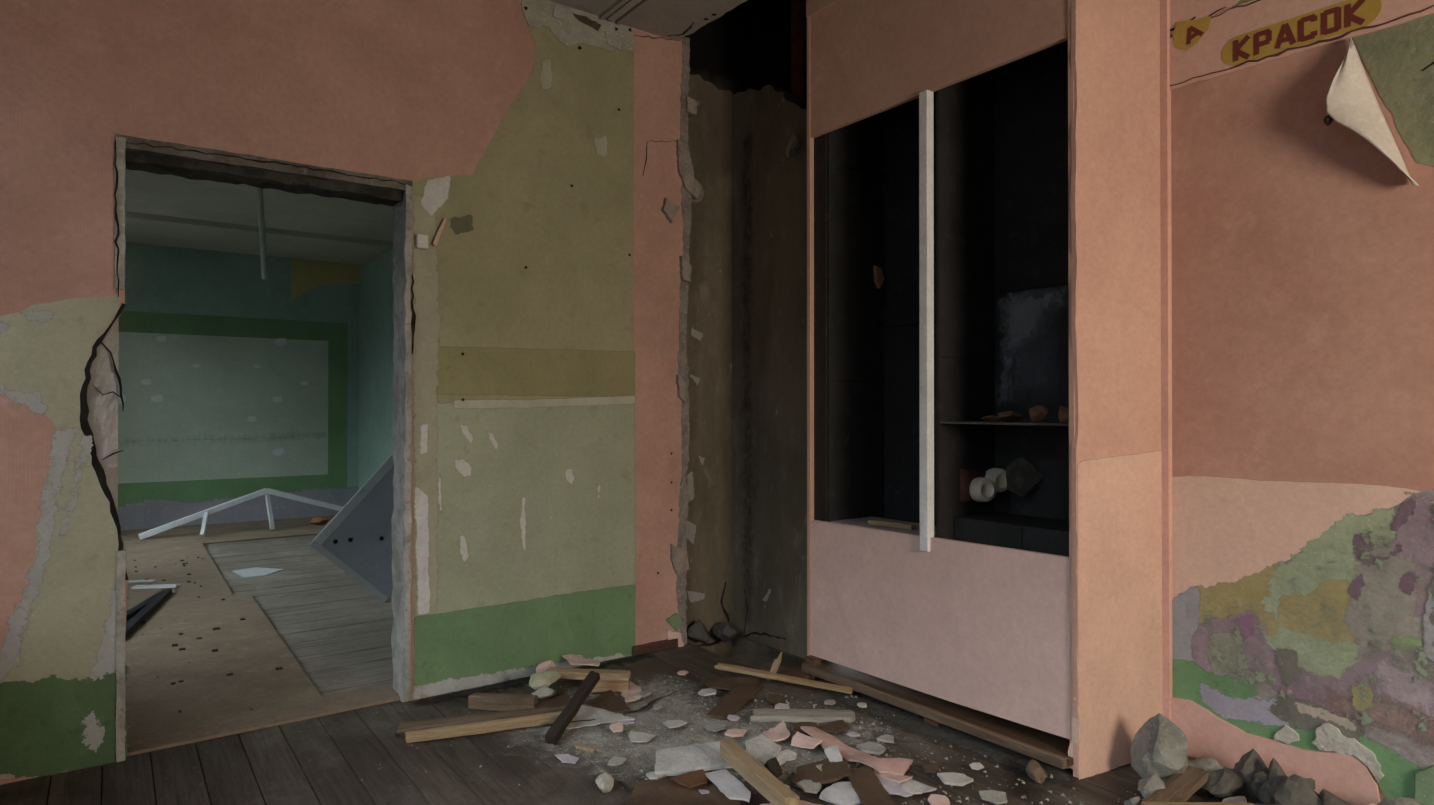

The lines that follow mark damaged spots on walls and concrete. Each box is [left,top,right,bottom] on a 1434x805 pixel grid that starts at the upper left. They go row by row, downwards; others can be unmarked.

peeling [0,296,359,779]
peeling [411,0,636,699]
spalling [661,0,791,645]
peeling [1172,489,1434,805]
peeling [1353,13,1434,166]